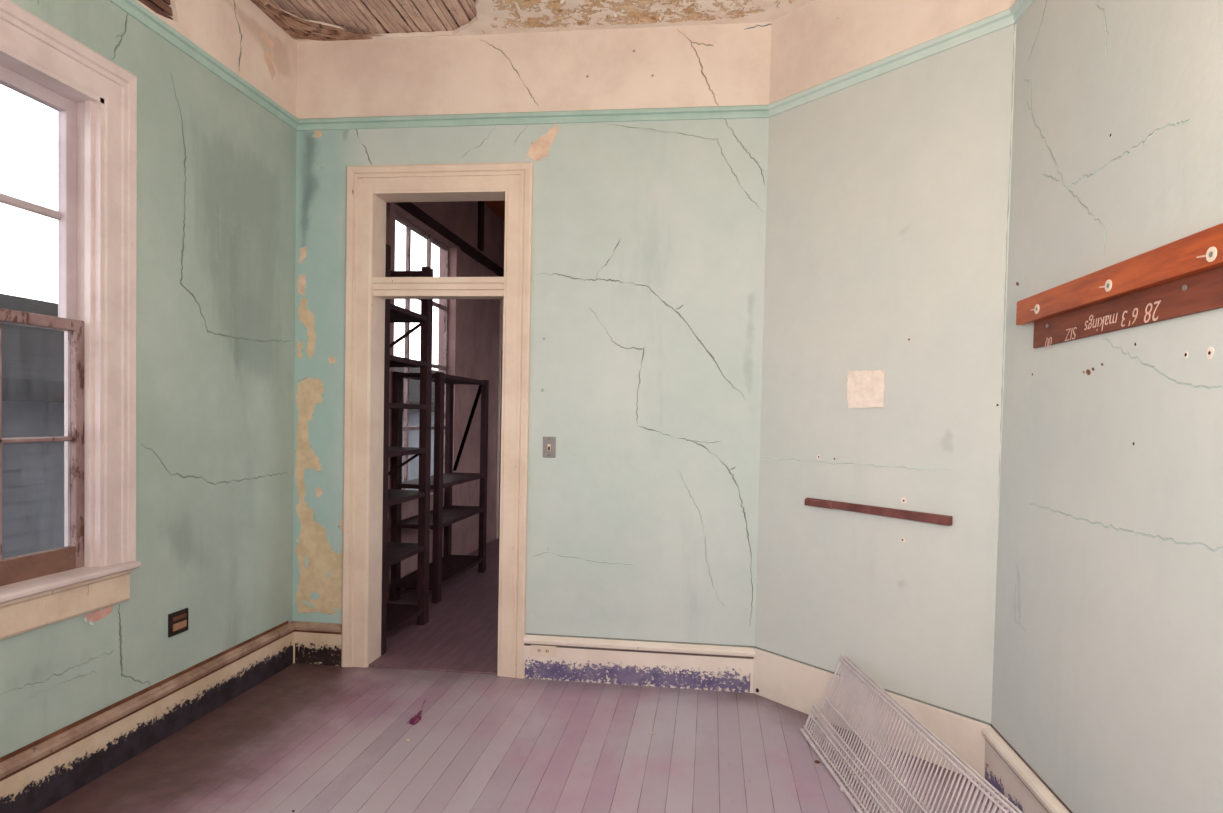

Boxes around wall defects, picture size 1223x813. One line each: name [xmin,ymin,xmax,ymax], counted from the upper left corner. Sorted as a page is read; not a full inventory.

peeling [481,0,795,34]
crack [170,73,291,342]
spalling [526,123,558,161]
crack [606,29,766,212]
crack [1024,0,1193,254]
crack [140,444,288,485]
peeling [295,246,336,366]
peeling [294,375,343,616]
crack [529,238,952,626]
crack [1101,338,1223,389]
peeling [0,642,341,813]
peeling [525,659,750,693]